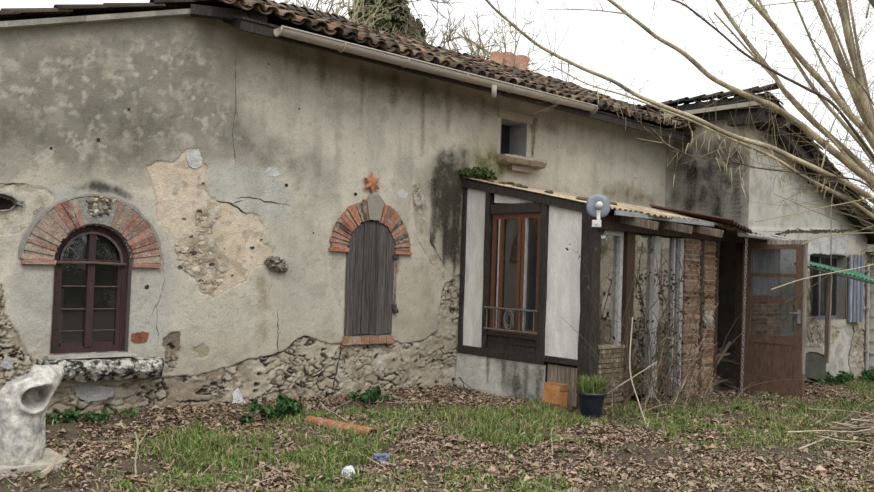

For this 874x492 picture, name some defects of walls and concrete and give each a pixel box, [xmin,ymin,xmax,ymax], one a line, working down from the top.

flaking render [146,148,274,298]
crack [218,196,288,214]
water stain [431,179,461,269]
flaking render [162,332,181,374]
flaking render [822,328,856,377]